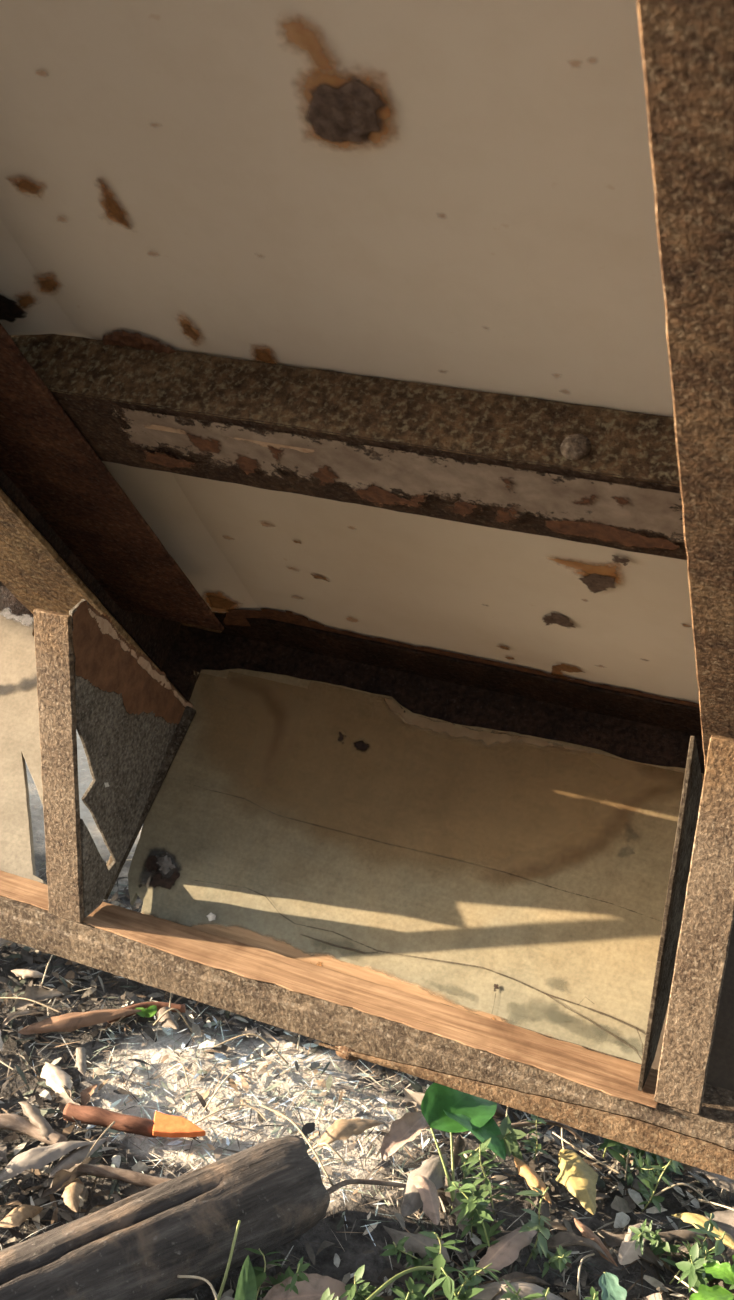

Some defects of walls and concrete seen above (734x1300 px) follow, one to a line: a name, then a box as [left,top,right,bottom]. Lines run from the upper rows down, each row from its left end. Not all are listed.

corrosion [282,19,393,149]